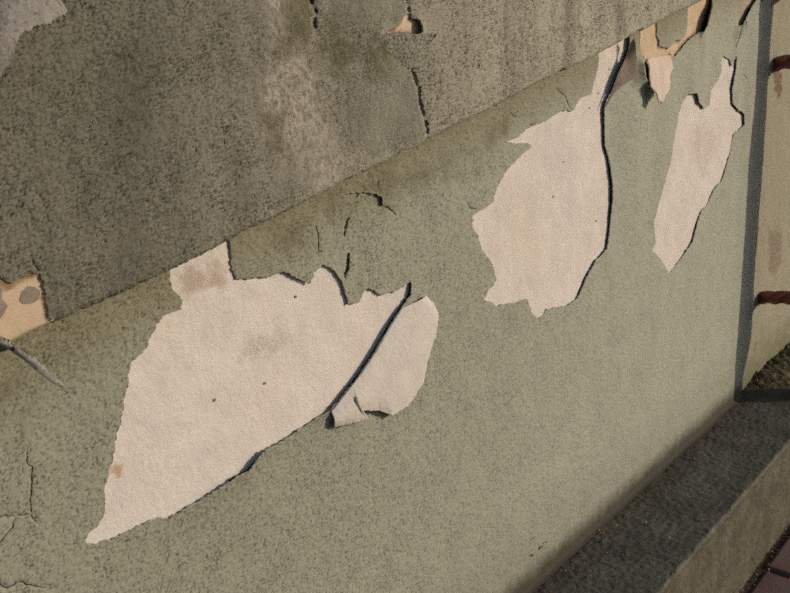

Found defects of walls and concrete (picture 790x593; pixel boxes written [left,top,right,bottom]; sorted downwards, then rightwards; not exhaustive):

peeling [0,0,68,78]
peeling [378,8,436,69]
peeling [736,0,755,47]
crack [411,69,428,134]
peeling [472,0,711,318]
peeling [652,57,744,273]
peeling [0,271,64,388]
peeling [86,241,439,543]